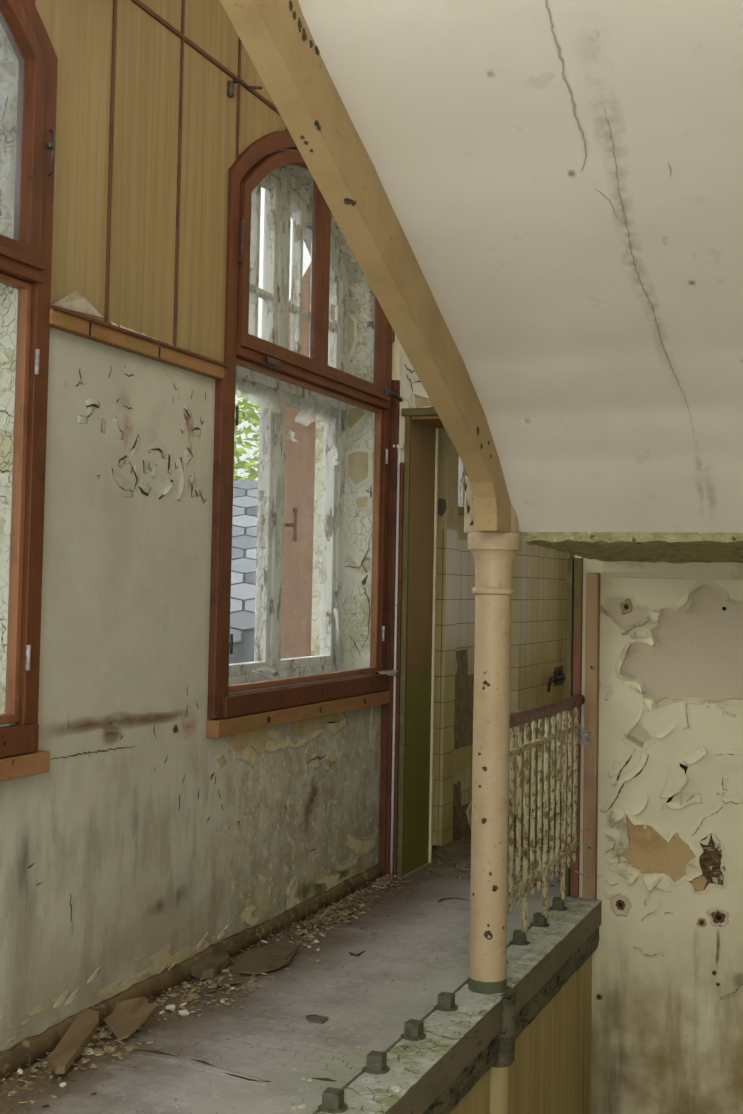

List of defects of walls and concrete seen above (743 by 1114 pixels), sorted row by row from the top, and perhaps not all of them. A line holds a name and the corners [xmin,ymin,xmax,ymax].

crack [545,0,697,444]
peeling [78,398,206,504]
water stain [69,715,174,739]
crack [50,724,255,830]
peeling [454,649,490,772]
peeling [600,580,743,753]
flaking render [197,903,259,948]
flaking render [286,876,303,910]
flaking render [313,831,376,891]
peeling [603,745,729,917]
flaking render [696,907,729,927]